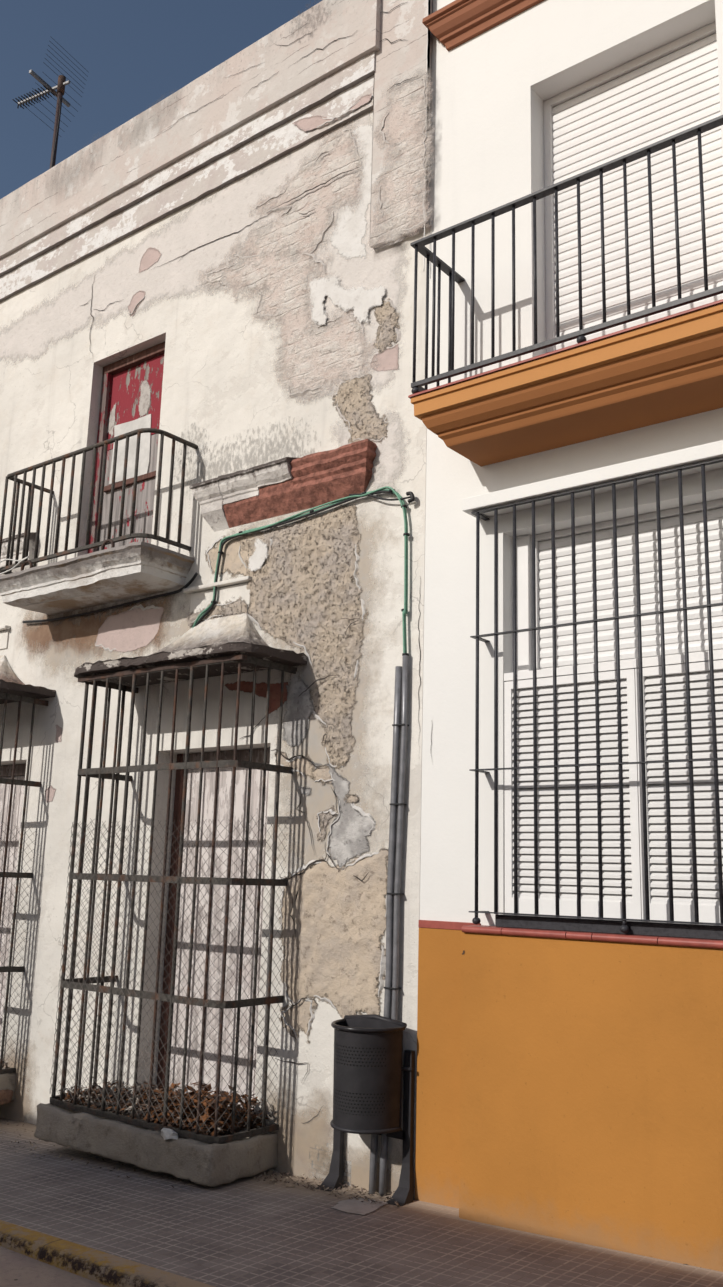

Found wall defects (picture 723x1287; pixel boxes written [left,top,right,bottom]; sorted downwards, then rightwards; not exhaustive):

peeling [0,72,432,496]
crack [156,29,349,136]
flaking render [186,500,389,1043]